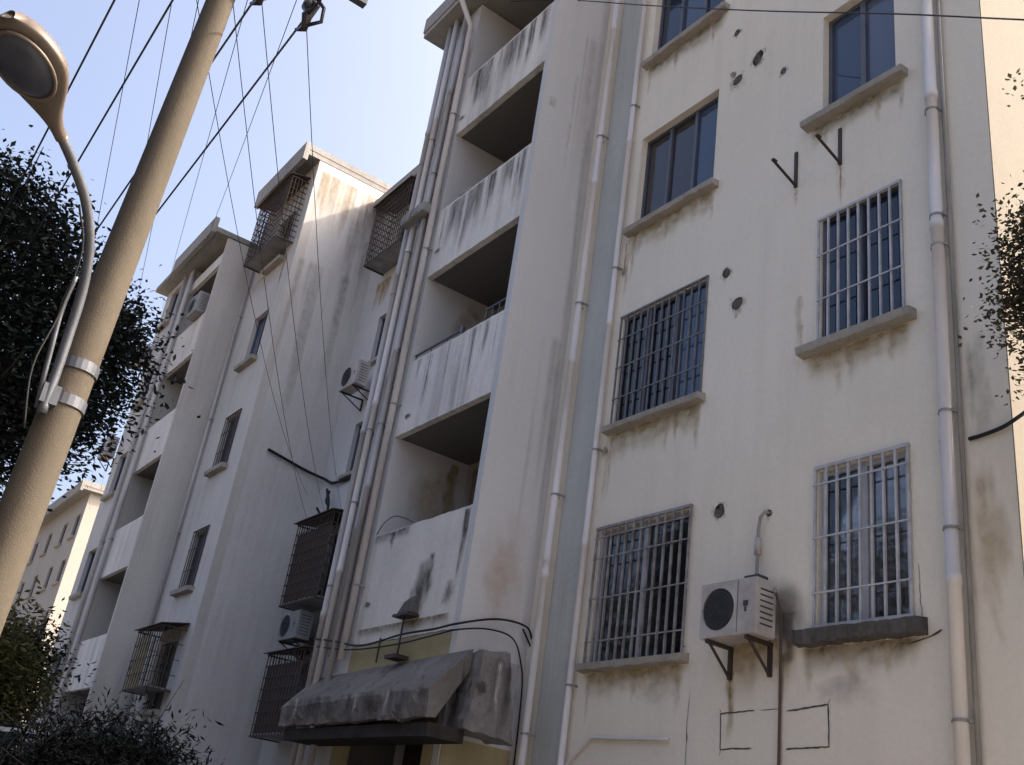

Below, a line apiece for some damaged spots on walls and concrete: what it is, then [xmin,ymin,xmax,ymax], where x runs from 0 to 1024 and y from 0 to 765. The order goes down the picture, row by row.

leakage [318,173,357,212]